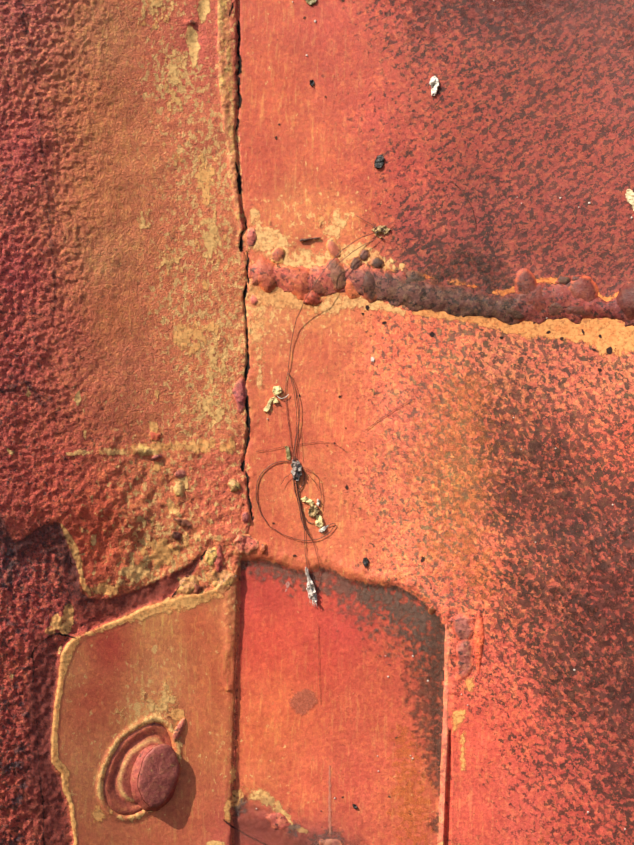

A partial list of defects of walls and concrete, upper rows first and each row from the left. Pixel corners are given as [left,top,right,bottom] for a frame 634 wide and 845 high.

crack [229,4,242,132]
crack [234,162,242,194]
crack [239,217,252,518]
peeling [61,524,200,596]
peeling [45,589,221,845]